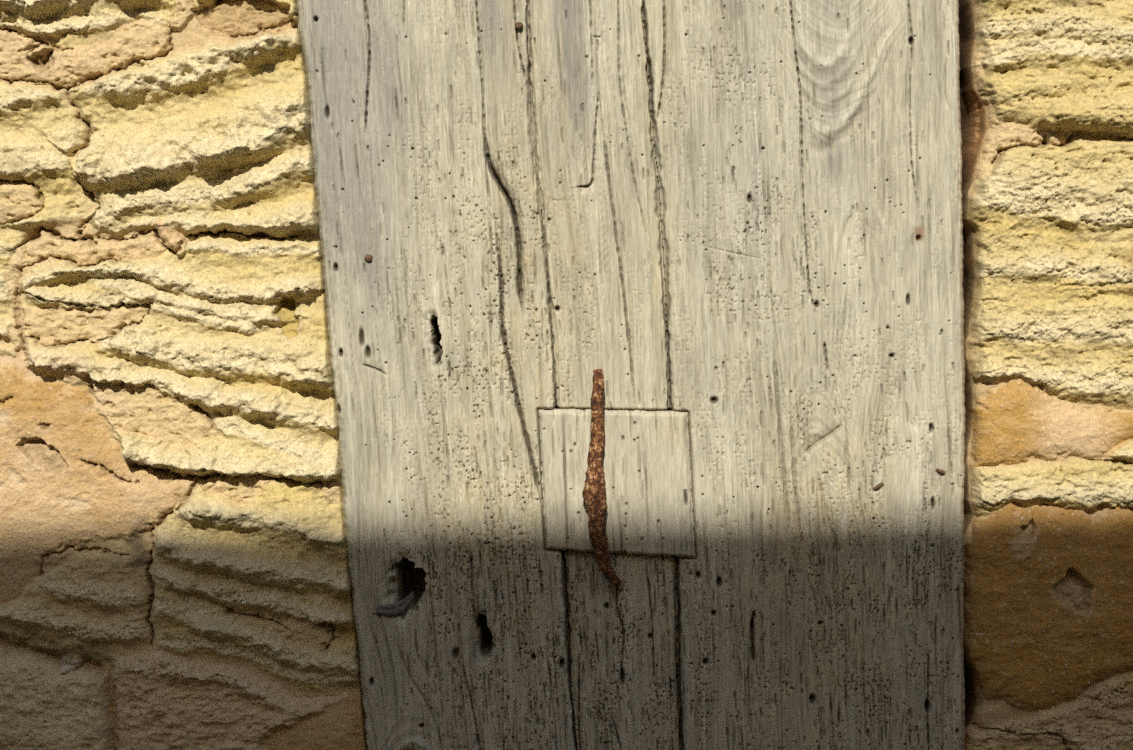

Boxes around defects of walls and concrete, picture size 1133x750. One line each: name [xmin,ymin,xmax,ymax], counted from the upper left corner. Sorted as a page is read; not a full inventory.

crack [230,13,298,38]
crack [992,133,1075,165]
crack [0,27,298,362]
crack [190,404,216,431]
crack [259,475,323,486]
crack [39,460,226,643]
crack [224,605,288,630]
crack [317,622,335,651]